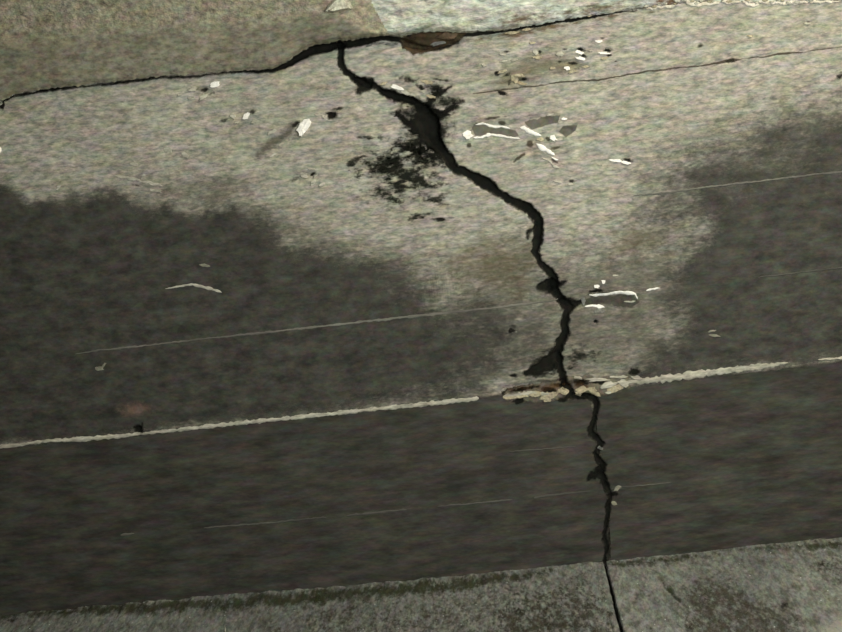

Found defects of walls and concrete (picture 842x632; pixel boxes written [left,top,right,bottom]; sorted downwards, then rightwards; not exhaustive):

crack [434,11,635,51]
crack [750,48,830,58]
water stain [424,85,459,127]
peeling [462,113,577,168]
crack [1,34,739,564]
spalling [581,275,638,323]
water stain [0,113,842,616]
spalling [503,369,643,404]